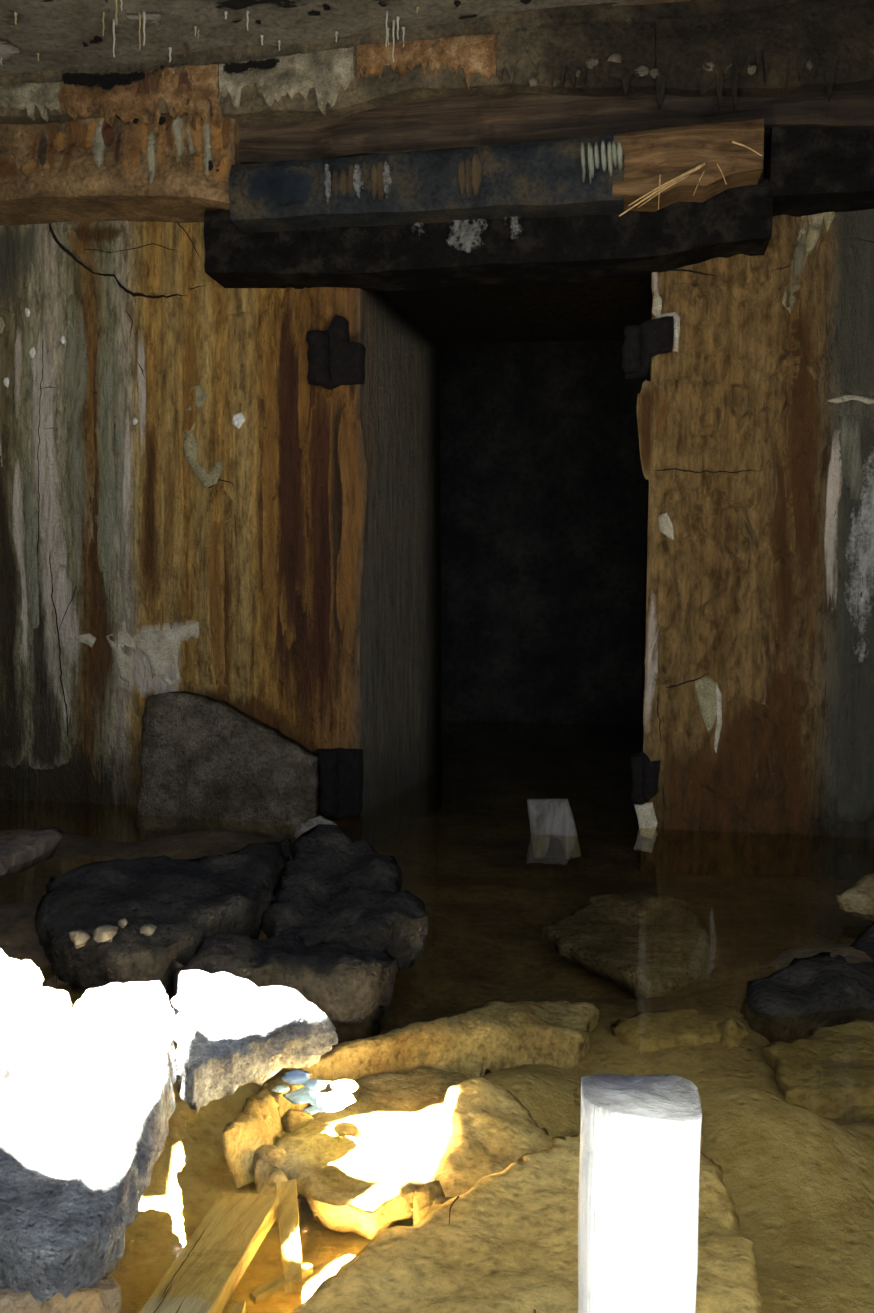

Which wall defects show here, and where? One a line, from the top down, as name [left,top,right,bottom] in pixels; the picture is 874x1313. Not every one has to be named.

crack [49,222,204,388]
damp [651,272,659,297]
damp [825,209,874,396]
damp [643,587,659,736]
damp [822,415,874,823]